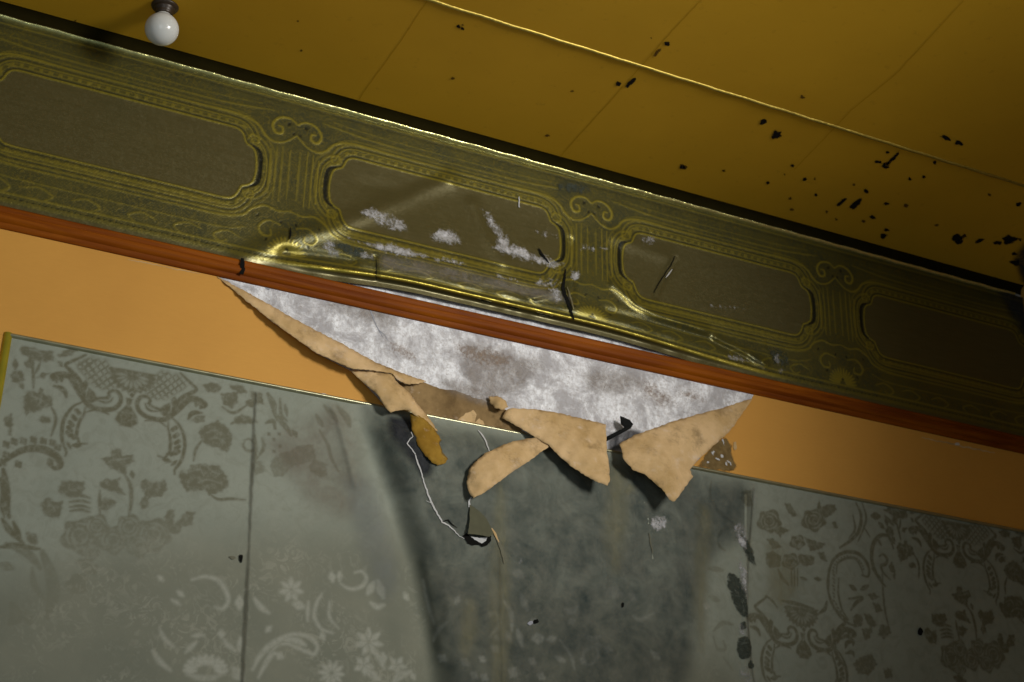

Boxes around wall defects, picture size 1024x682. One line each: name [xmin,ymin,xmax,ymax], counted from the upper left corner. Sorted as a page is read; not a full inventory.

damp [875,150,900,169]
damp [826,184,868,220]
damp [951,234,1024,279]
crack [407,432,463,538]
damp [382,417,755,682]